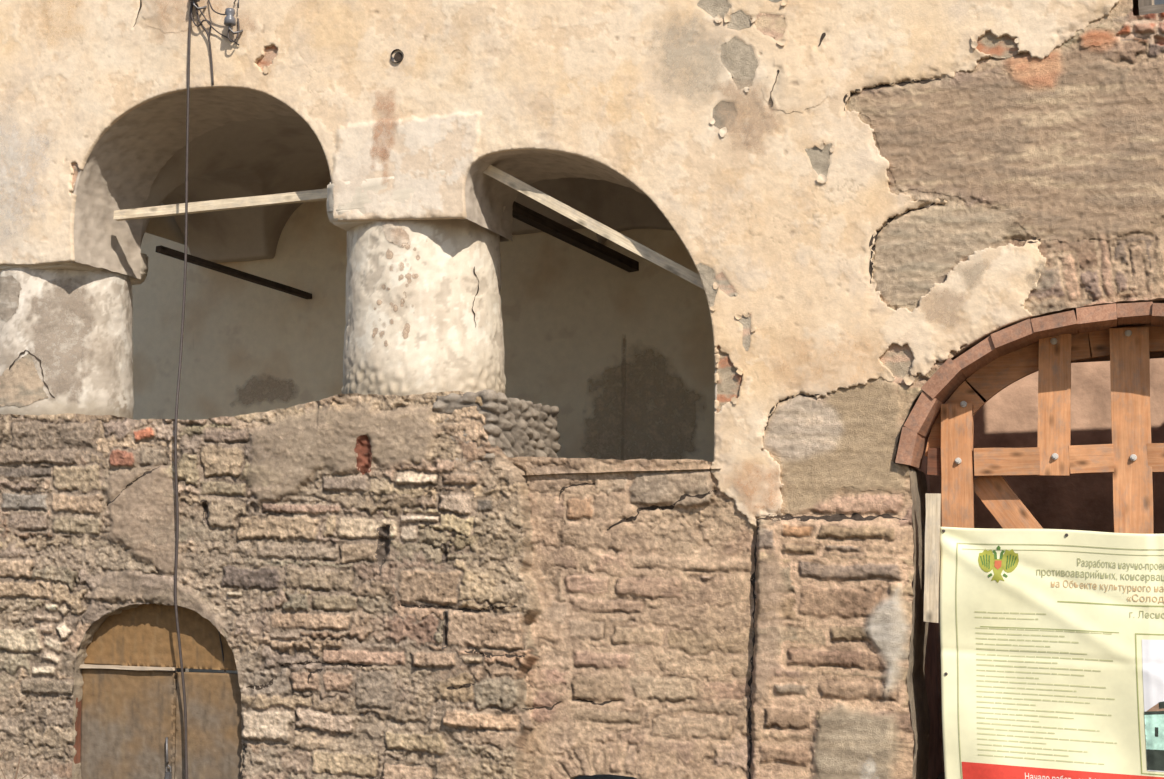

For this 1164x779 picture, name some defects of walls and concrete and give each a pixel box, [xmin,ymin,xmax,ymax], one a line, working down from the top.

spalling [257,45,278,74]
spalling [697,0,788,92]
crack [768,70,780,108]
spalling [709,101,736,137]
spalling [0,275,22,322]
spalling [696,263,738,311]
spalling [735,311,757,351]
spalling [0,353,48,407]
spalling [716,346,743,413]
spalling [880,344,916,385]